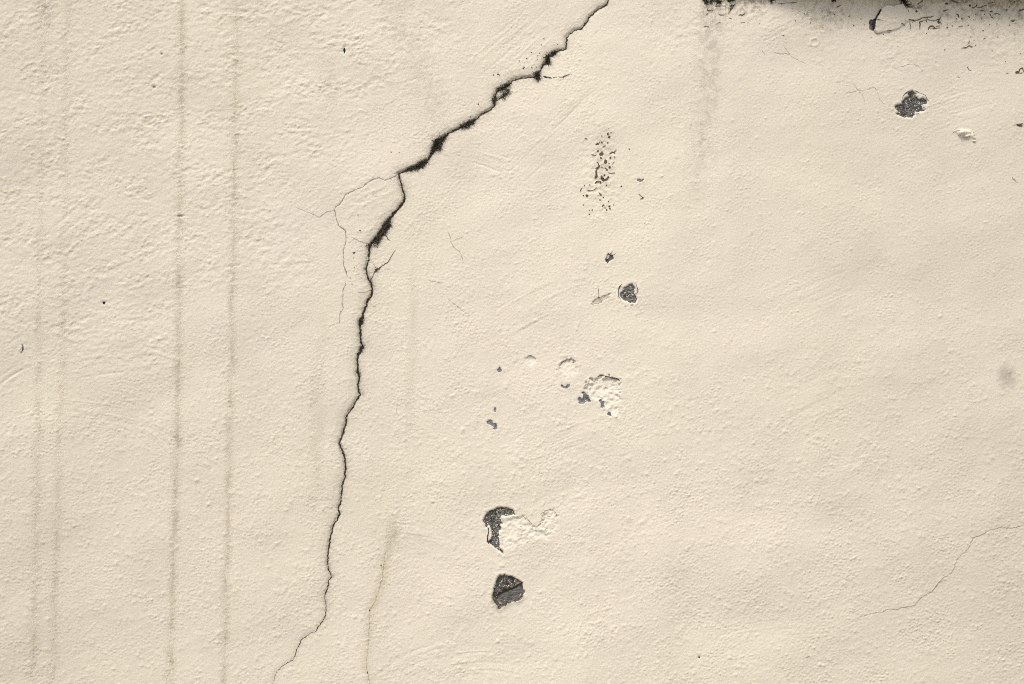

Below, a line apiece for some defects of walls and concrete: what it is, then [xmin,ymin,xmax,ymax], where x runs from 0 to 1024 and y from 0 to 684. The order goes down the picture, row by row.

spalling [895,90,930,118]
spalling [591,283,638,305]
crack [272,0,609,684]
spalling [561,370,626,424]
spalling [483,504,563,559]
spalling [492,574,525,609]